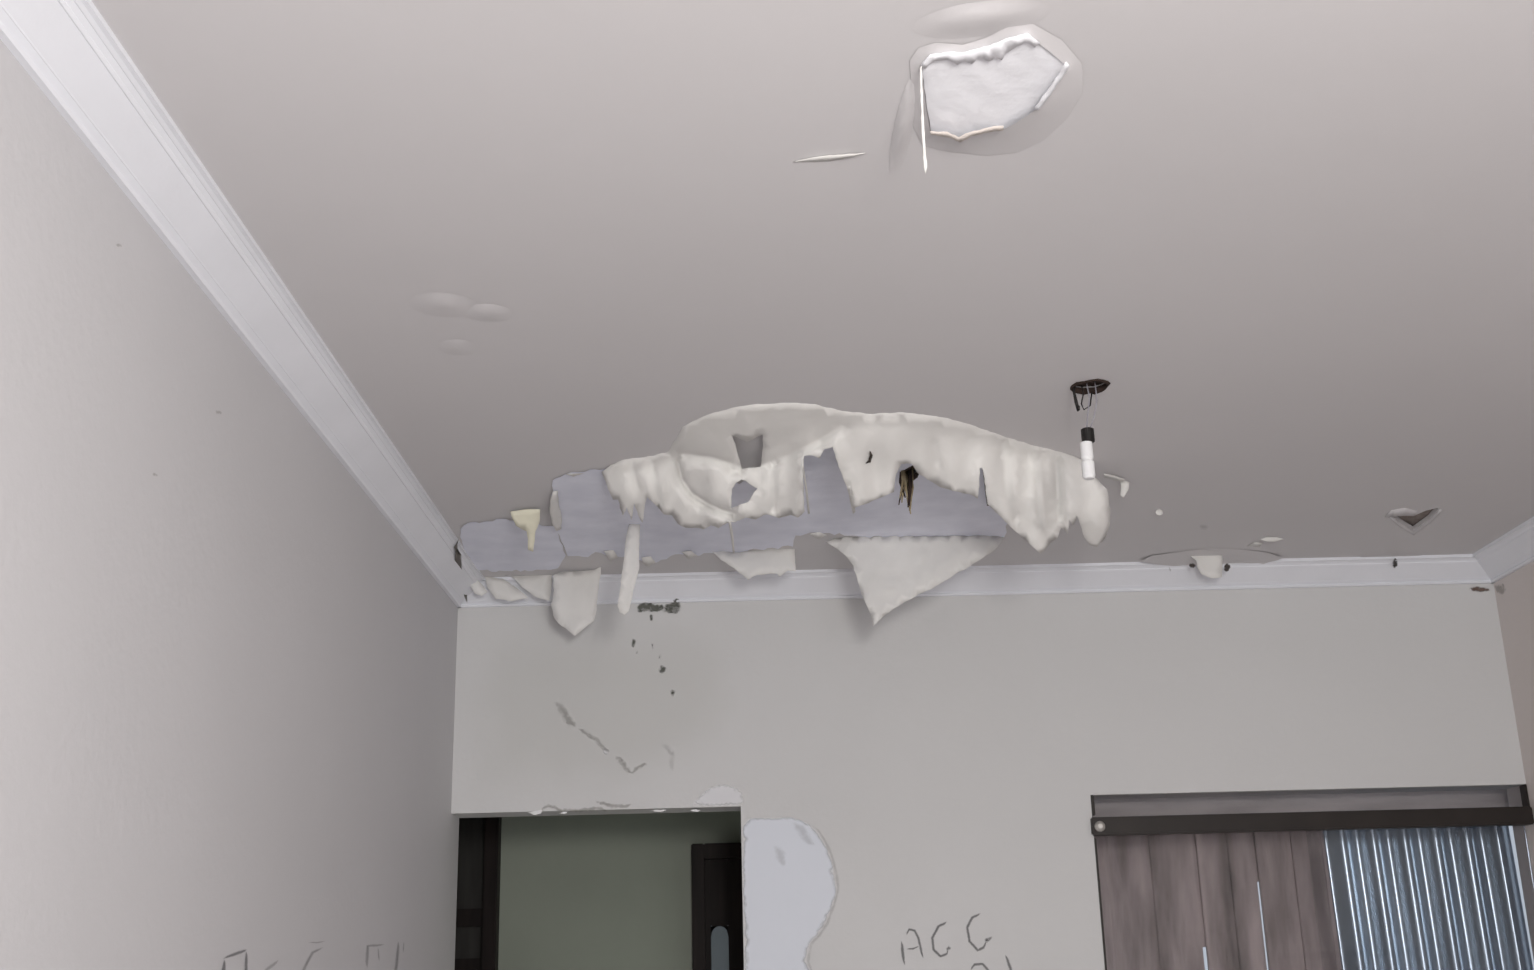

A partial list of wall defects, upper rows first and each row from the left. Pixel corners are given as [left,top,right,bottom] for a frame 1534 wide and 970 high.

peeling [910,24,1083,175]
peeling [460,403,1129,636]
peeling [1362,553,1421,568]
peeling [1385,508,1442,535]
peeling [743,818,835,970]